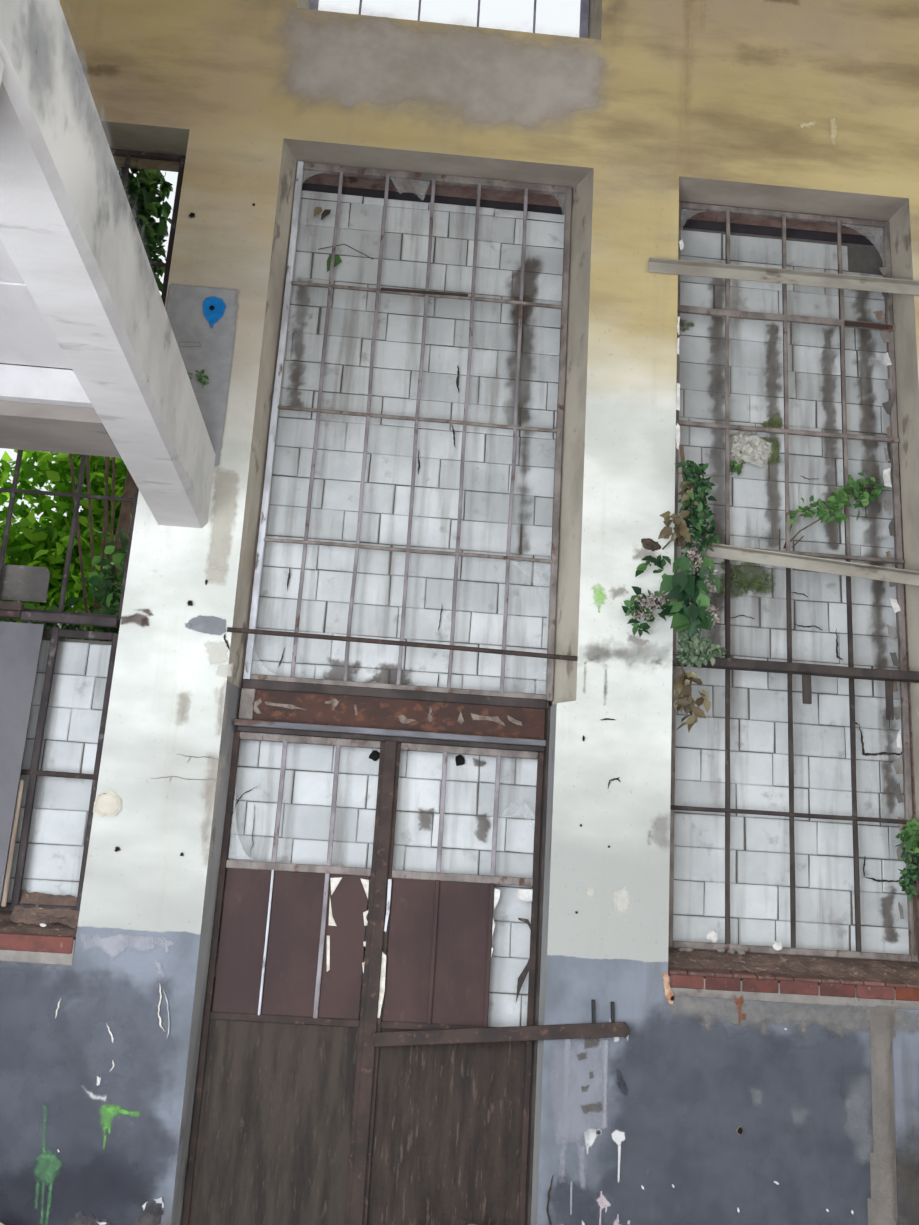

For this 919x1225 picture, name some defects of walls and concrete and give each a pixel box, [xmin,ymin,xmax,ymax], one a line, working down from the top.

spalling [663,972,674,1004]
water stain [0,934,174,1225]
spalling [616,1069,628,1095]